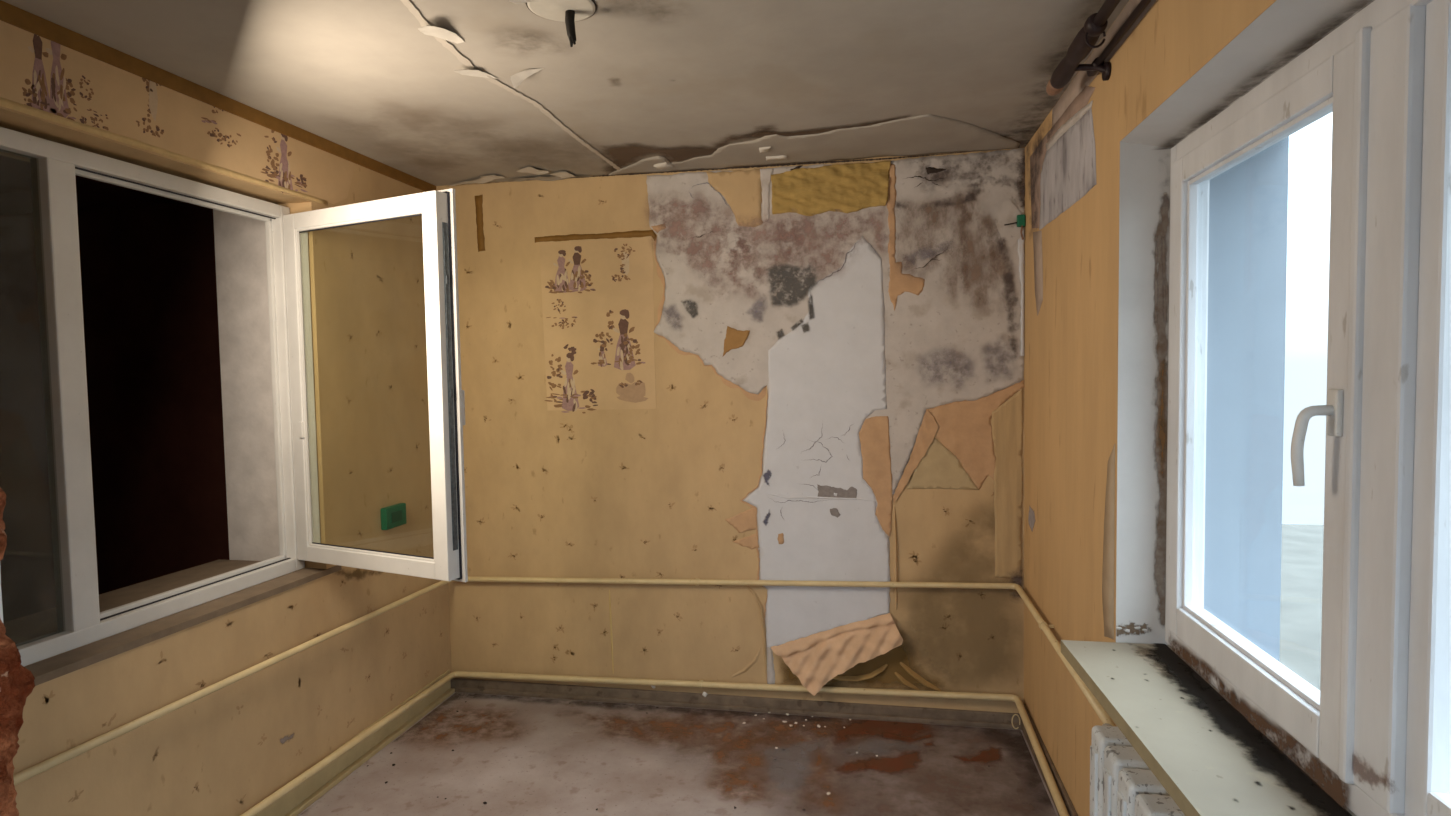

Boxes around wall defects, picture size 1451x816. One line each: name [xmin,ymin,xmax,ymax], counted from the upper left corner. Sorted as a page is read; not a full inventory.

peeling [450,167,590,186]
water stain [653,199,882,338]
water stain [897,162,1016,372]
flaking render [608,114,1025,684]
water stain [1138,194,1352,816]